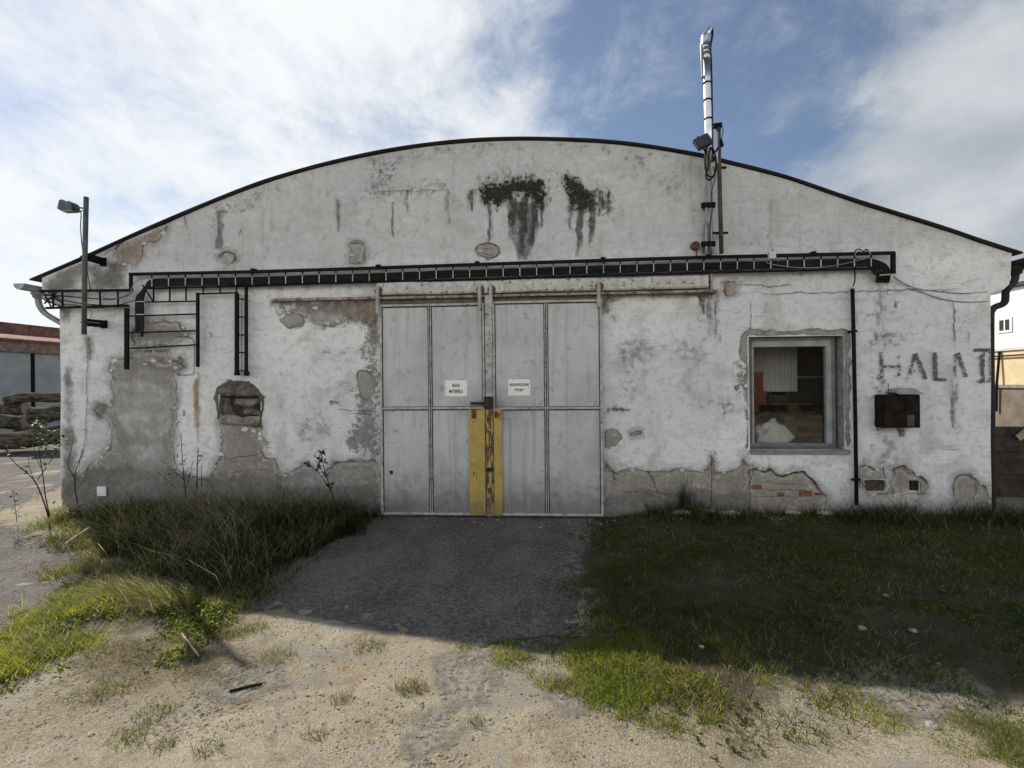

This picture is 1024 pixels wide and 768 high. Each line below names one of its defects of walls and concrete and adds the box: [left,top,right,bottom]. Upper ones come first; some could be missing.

leakage [468,174,547,256]
leakage [561,174,610,246]
spalling [47,226,167,290]
spalling [62,301,381,515]
spalling [604,328,852,517]
spalling [858,465,929,496]
spalling [953,473,991,509]